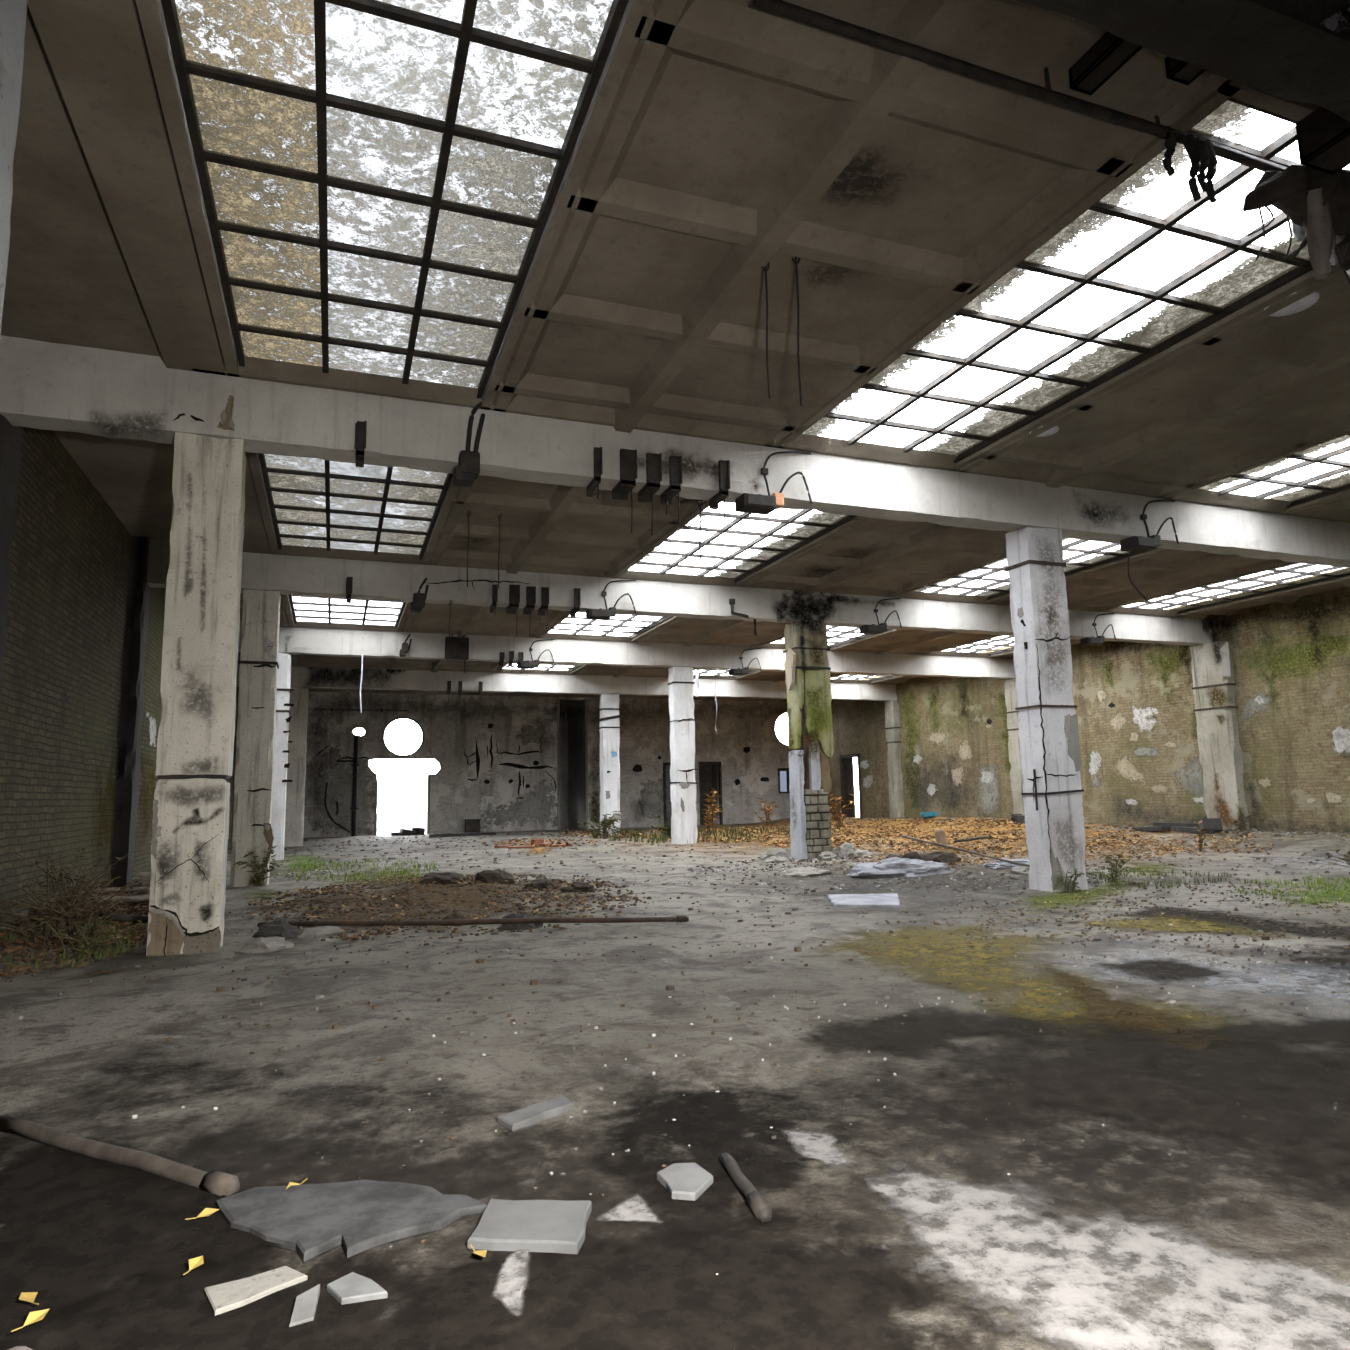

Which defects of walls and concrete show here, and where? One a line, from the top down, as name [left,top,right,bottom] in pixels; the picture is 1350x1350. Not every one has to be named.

peeling [1319,2,1350,32]
damp [1211,596,1350,662]
damp [1105,641,1164,685]
peeling [1064,689,1204,803]
peeling [1331,726,1350,755]
damp [912,759,970,807]